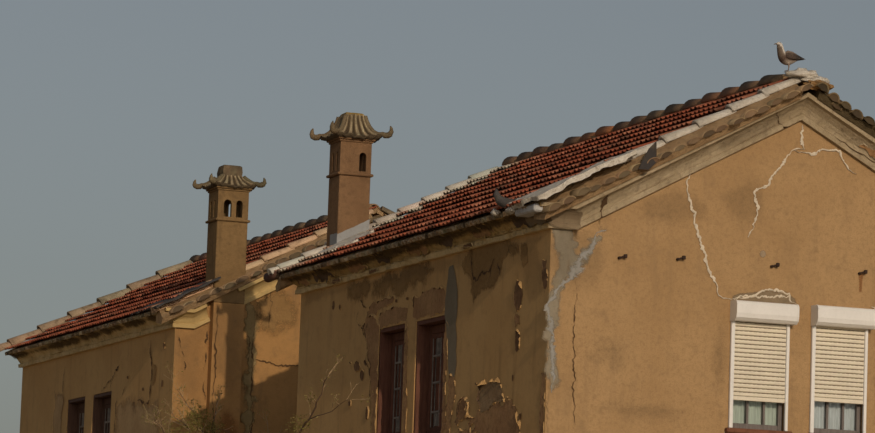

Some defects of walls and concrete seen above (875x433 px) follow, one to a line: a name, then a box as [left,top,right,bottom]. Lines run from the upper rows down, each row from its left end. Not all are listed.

crack [748,117,873,237]
crack [247,292,298,433]
peeling [310,252,433,433]
peeling [441,322,521,433]
peeling [437,224,528,302]
spalling [513,279,523,352]
crack [686,174,796,304]